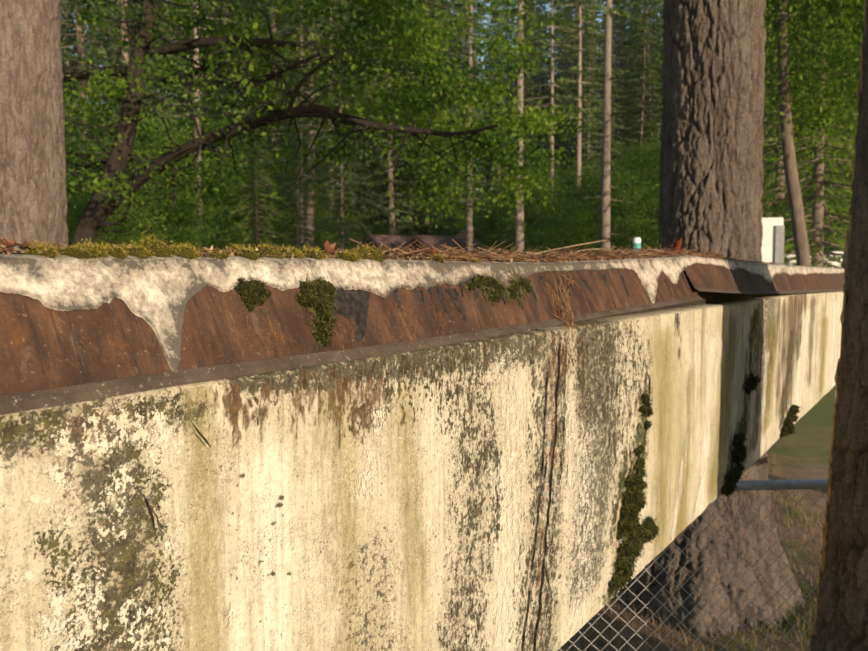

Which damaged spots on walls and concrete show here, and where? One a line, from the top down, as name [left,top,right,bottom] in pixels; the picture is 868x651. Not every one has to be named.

corrosion [66,405,148,456]
water stain [0,320,653,651]
crack [522,343,567,651]
water stain [736,293,836,449]